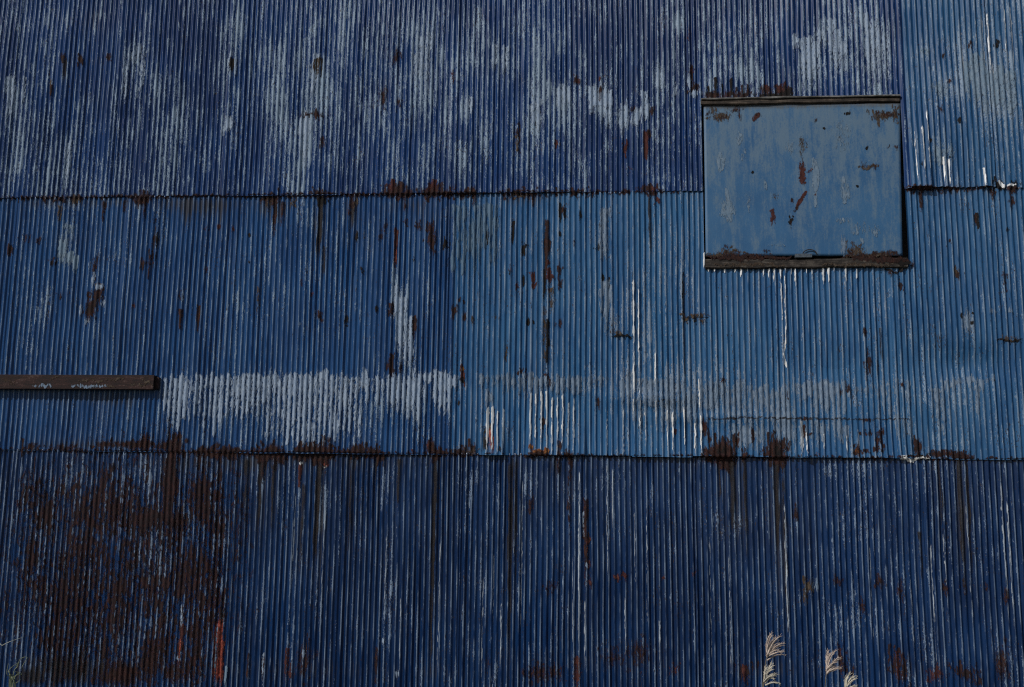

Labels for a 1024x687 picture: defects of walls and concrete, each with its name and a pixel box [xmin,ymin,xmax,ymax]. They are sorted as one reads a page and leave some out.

rust [866,104,900,127]
rust [769,138,816,226]
rust [0,178,684,391]
rust [706,245,792,268]
rust [822,235,915,291]
peeling [71,284,458,447]
rust [0,418,1023,687]